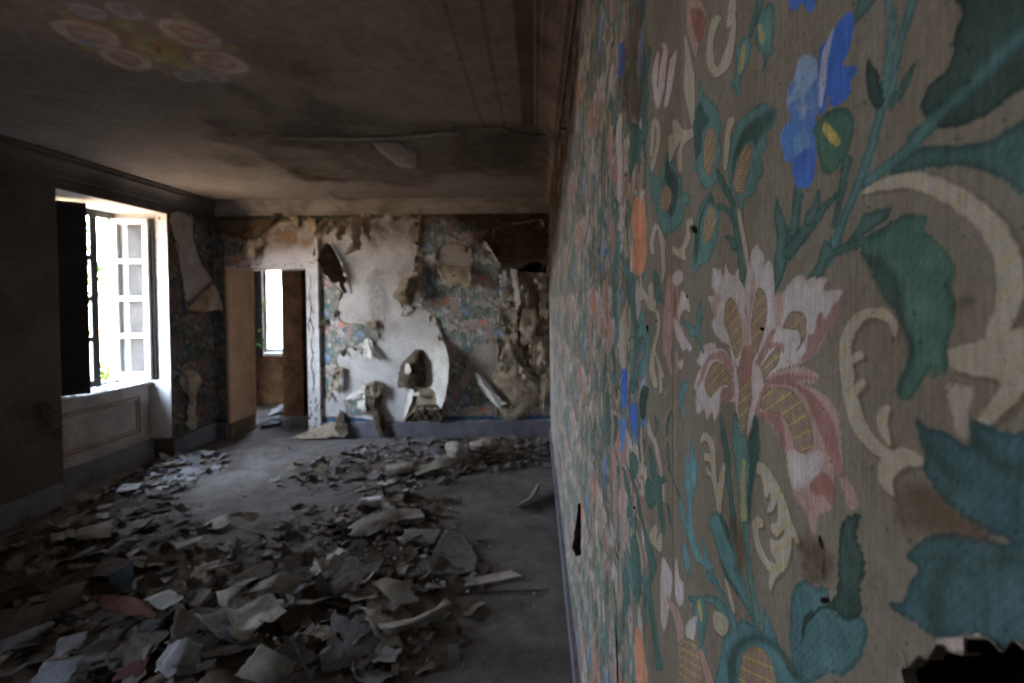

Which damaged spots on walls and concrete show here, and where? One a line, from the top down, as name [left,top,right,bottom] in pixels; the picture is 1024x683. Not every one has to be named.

flaking render [158,209,223,313]
flaking render [216,213,550,430]
flaking render [896,636,1024,683]